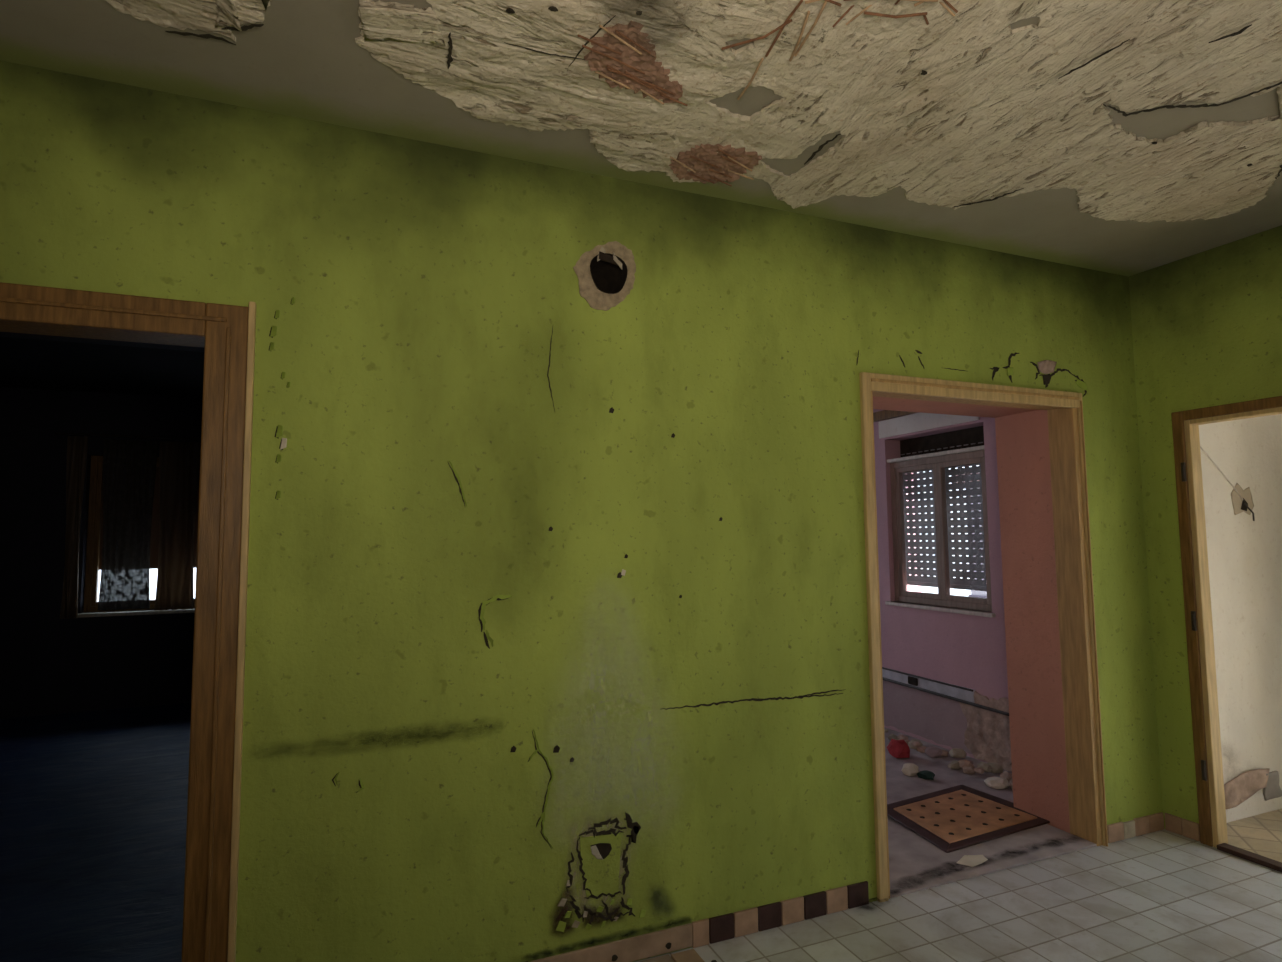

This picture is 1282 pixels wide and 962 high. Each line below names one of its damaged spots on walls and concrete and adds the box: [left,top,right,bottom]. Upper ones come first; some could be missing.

flaking render [105,0,271,45]
flaking render [355,0,1282,223]
spalling [573,241,636,311]
crack [660,689,846,710]
crack [528,729,641,924]